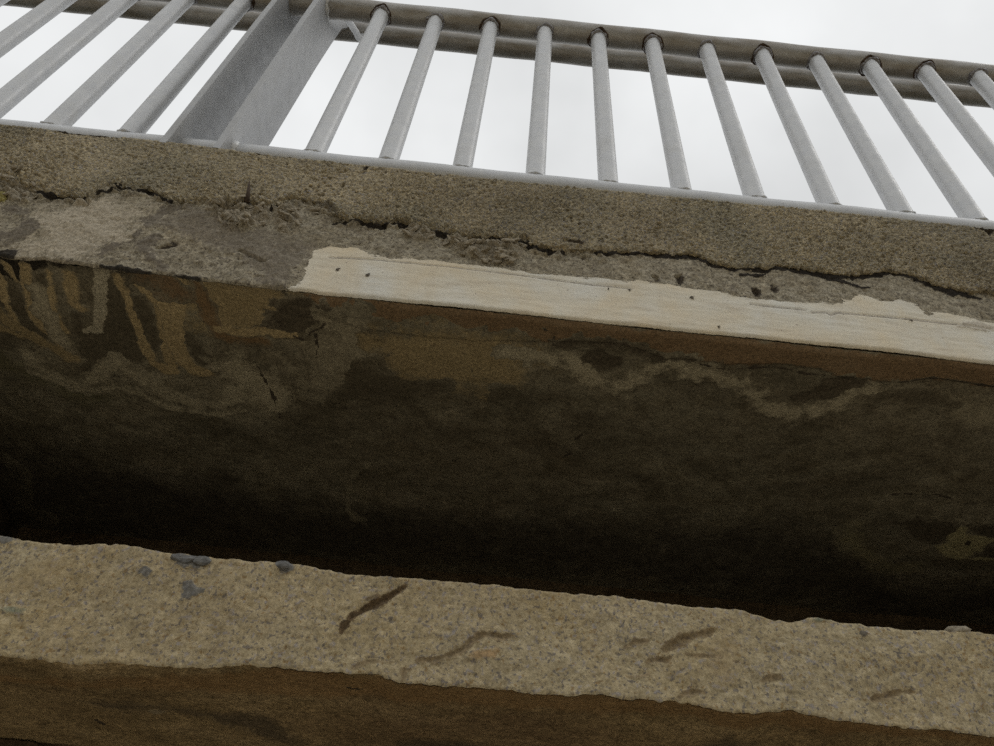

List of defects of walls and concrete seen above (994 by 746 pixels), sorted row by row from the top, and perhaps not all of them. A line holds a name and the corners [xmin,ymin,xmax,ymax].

crack [36,183,173,204]
spalling [205,195,341,236]
spalling [402,222,528,266]
crack [328,219,633,290]
damp [0,188,994,447]
damp [0,418,994,625]